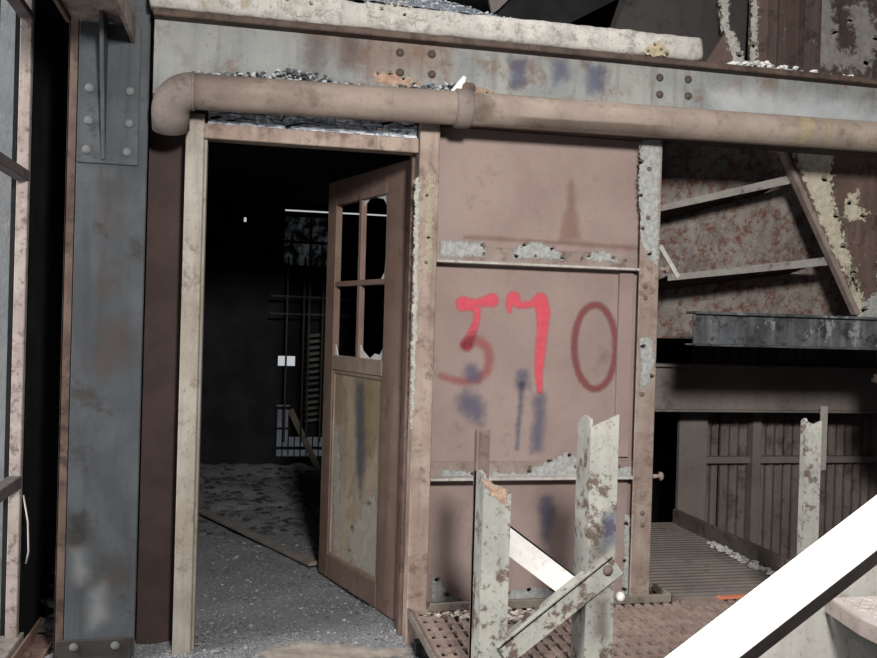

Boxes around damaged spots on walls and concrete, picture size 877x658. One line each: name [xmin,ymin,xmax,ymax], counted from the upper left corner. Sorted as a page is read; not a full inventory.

peeling [718,0,760,66]
peeling [820,0,877,78]
peeling [511,241,566,261]
peeling [586,250,620,264]
peeling [637,139,663,267]
peeling [791,153,877,317]
peeling [639,336,655,389]
peeling [332,423,378,577]
rust [481,479,508,507]